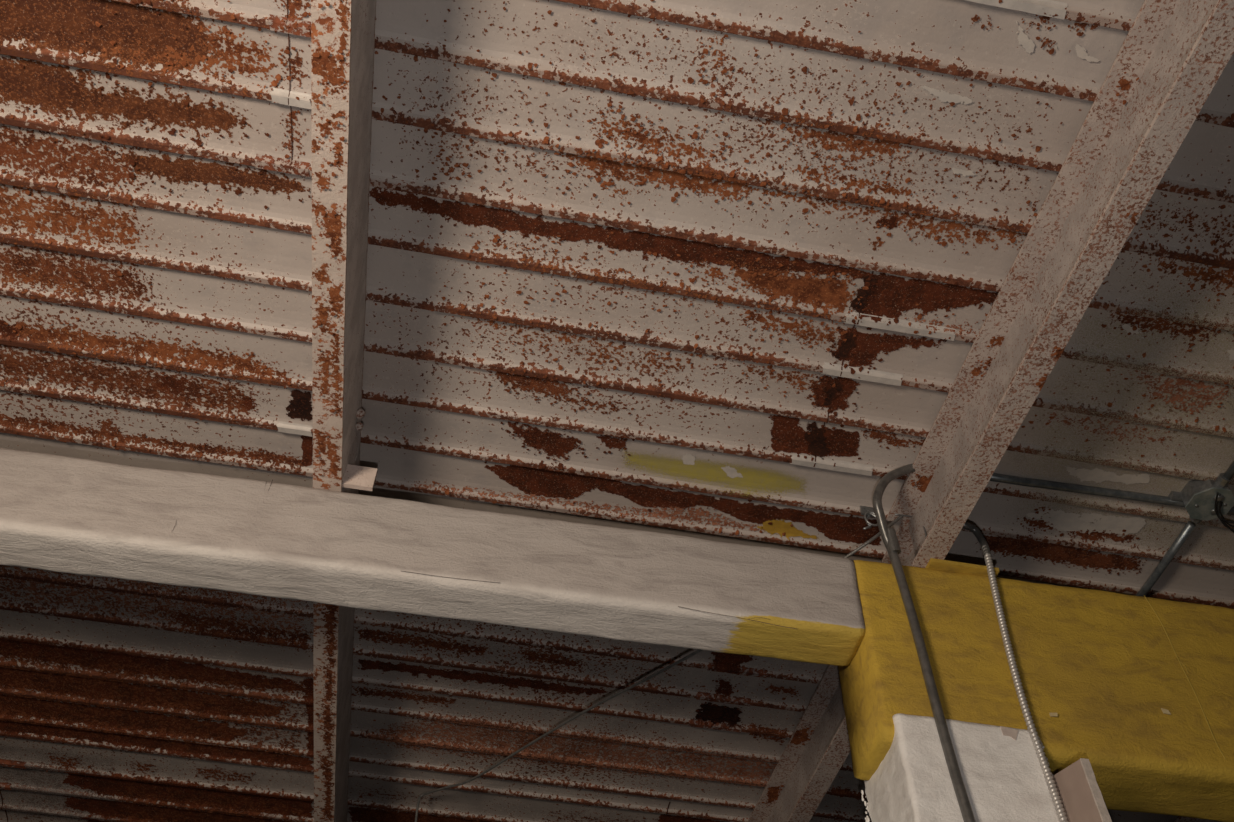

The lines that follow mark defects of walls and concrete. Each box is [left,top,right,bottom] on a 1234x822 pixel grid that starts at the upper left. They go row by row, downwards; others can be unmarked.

corrosion [374,0,1063,254]
corrosion [1022,8,1099,55]
corrosion [1116,72,1139,105]
corrosion [0,0,350,480]
corrosion [1124,192,1234,302]
corrosion [369,186,1004,467]
corrosion [1021,302,1234,461]
corrosion [411,421,881,546]
corrosion [910,474,933,496]
corrosion [976,507,1147,575]
corrosion [351,611,814,806]
corrosion [829,786,867,804]